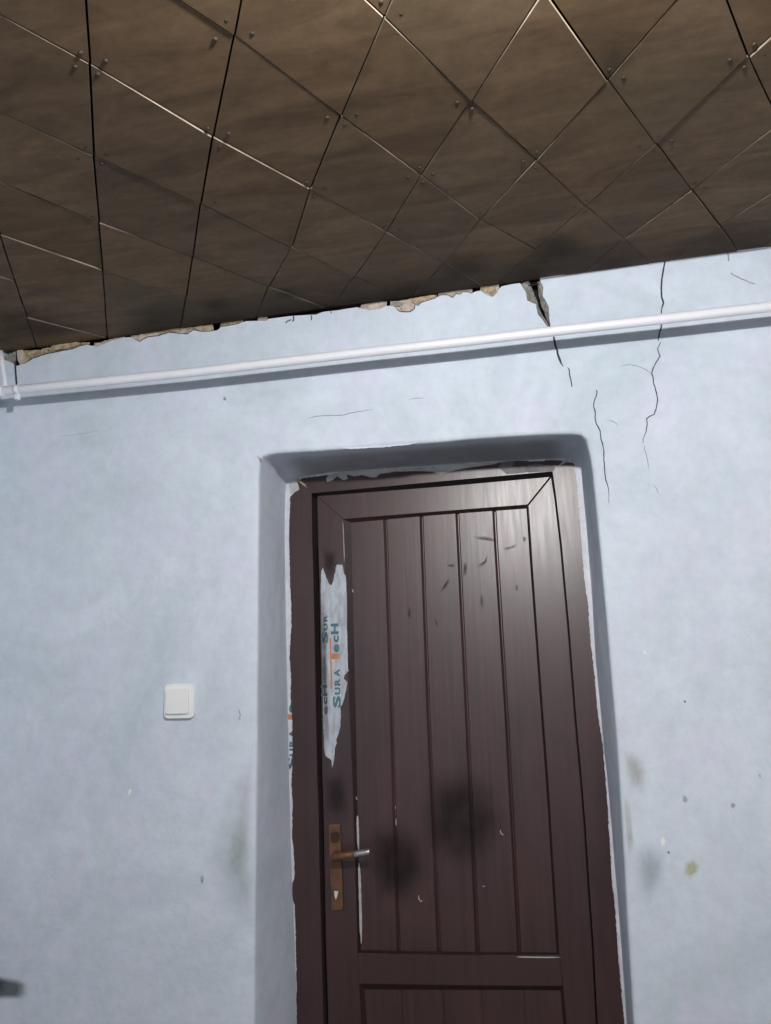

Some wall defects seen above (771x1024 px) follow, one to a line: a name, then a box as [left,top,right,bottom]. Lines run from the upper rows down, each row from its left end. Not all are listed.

flaking render [4,321,243,365]
crack [521,281,619,501]
crack [623,261,666,494]